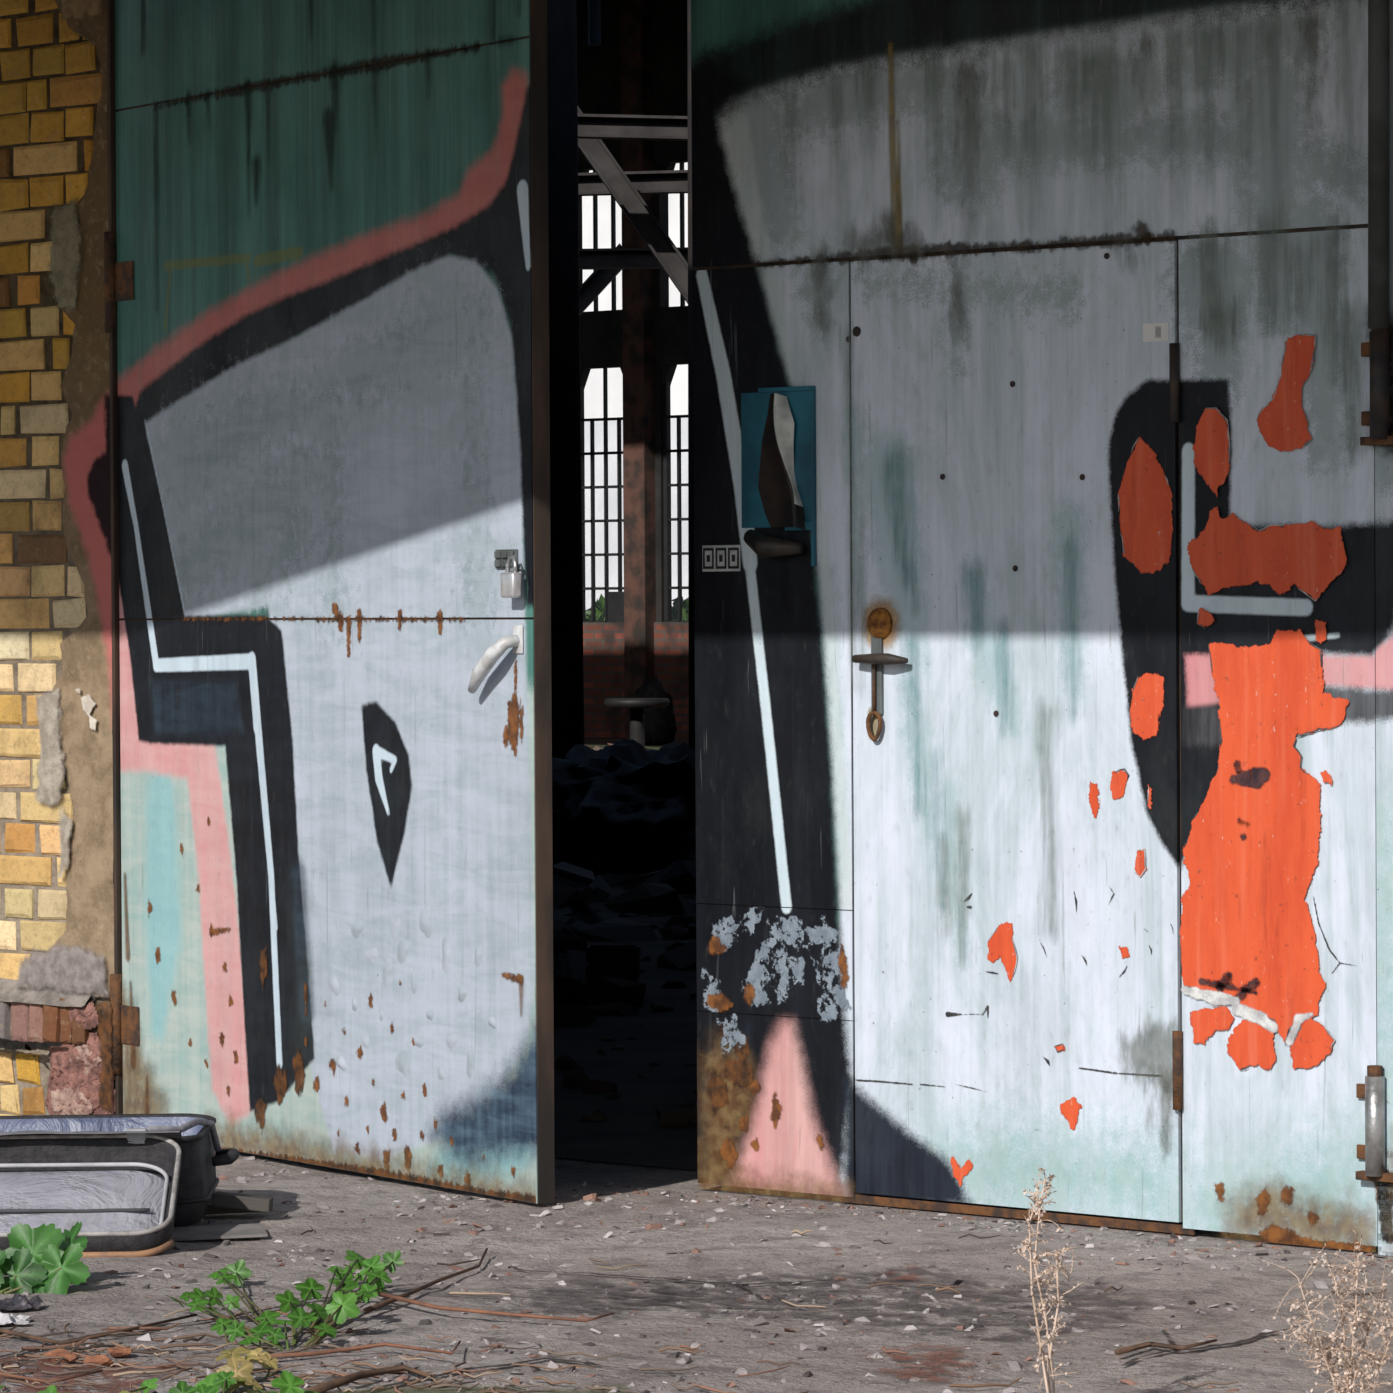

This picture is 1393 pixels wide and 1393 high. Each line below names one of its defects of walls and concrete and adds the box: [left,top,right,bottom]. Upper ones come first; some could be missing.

rust [757,44,1174,282]
rust [183,603,464,658]
flaking render [35,688,97,878]
rust [503,660,523,757]
peeling [1088,768,1129,819]
peeling [1117,407,1349,1071]
peeling [701,907,851,1054]
peeling [987,922,1018,982]
rust [219,1037,536,1203]
rust [703,1036,799,1197]
peeling [1060,1097,1082,1130]
rust [1238,1170,1393,1252]